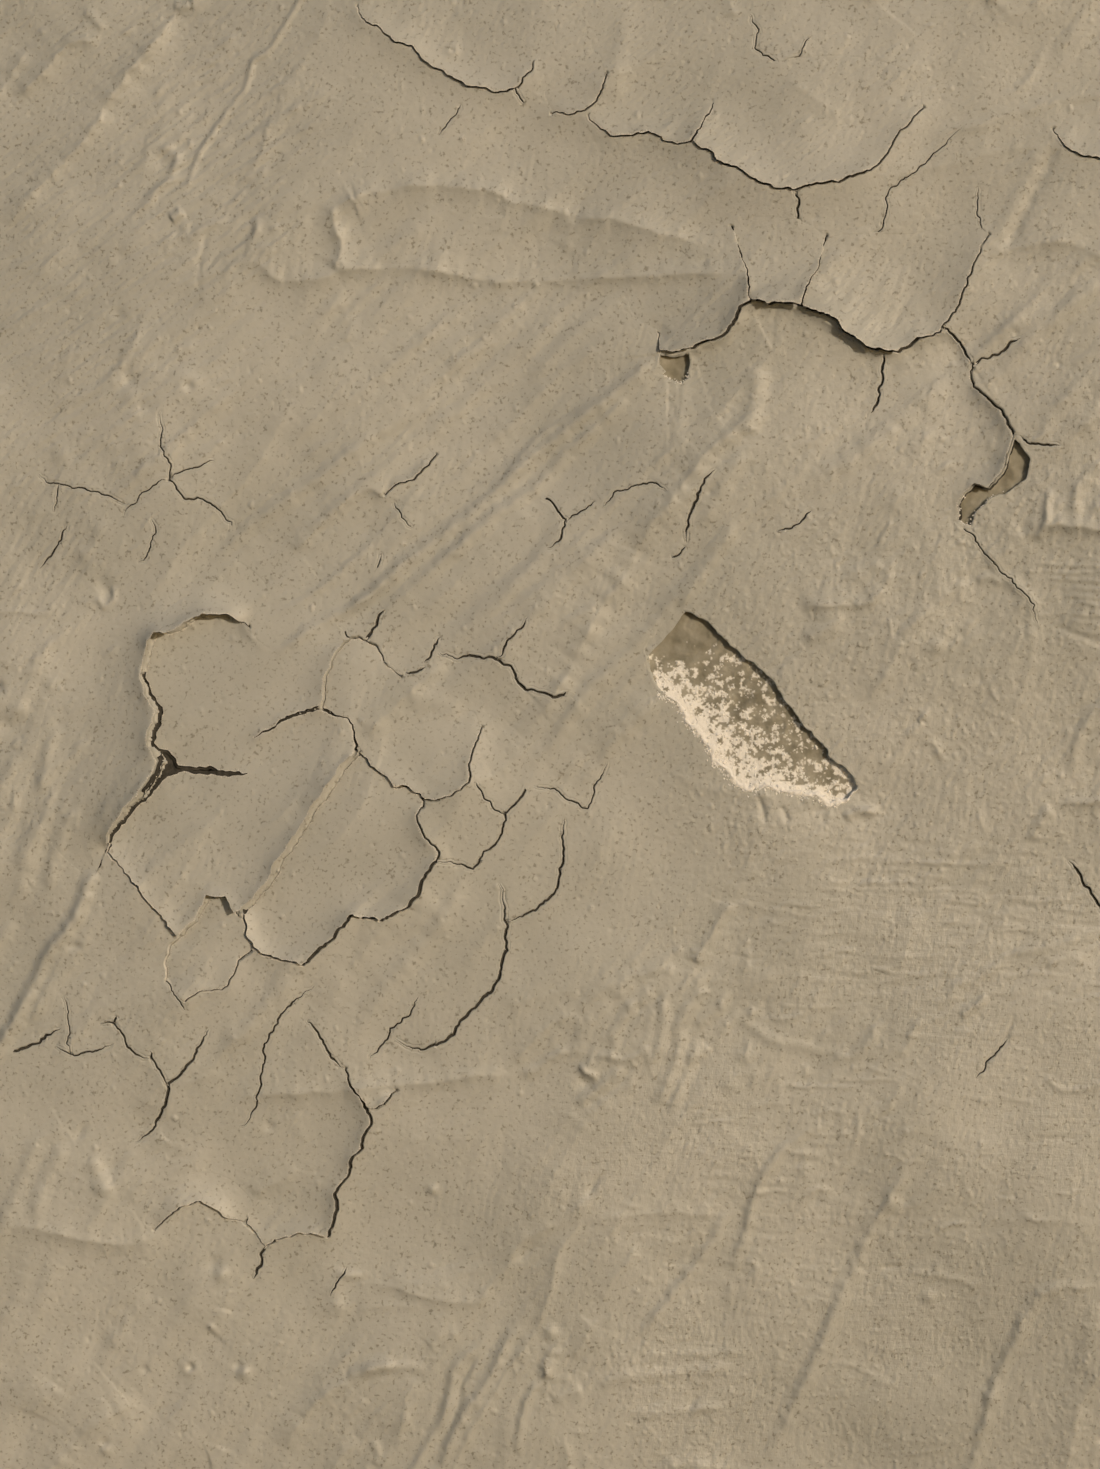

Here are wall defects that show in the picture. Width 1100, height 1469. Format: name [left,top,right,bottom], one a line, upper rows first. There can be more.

peeling [355,0,1060,624]
crack [38,411,239,570]
crack [372,552,383,583]
crack [392,502,413,529]
crack [541,468,716,560]
peeling [33,552,484,1011]
crack [405,616,590,722]
peeling [642,608,861,809]
crack [239,761,609,1128]
crack [2,997,210,1144]
peeling [144,1067,398,1280]